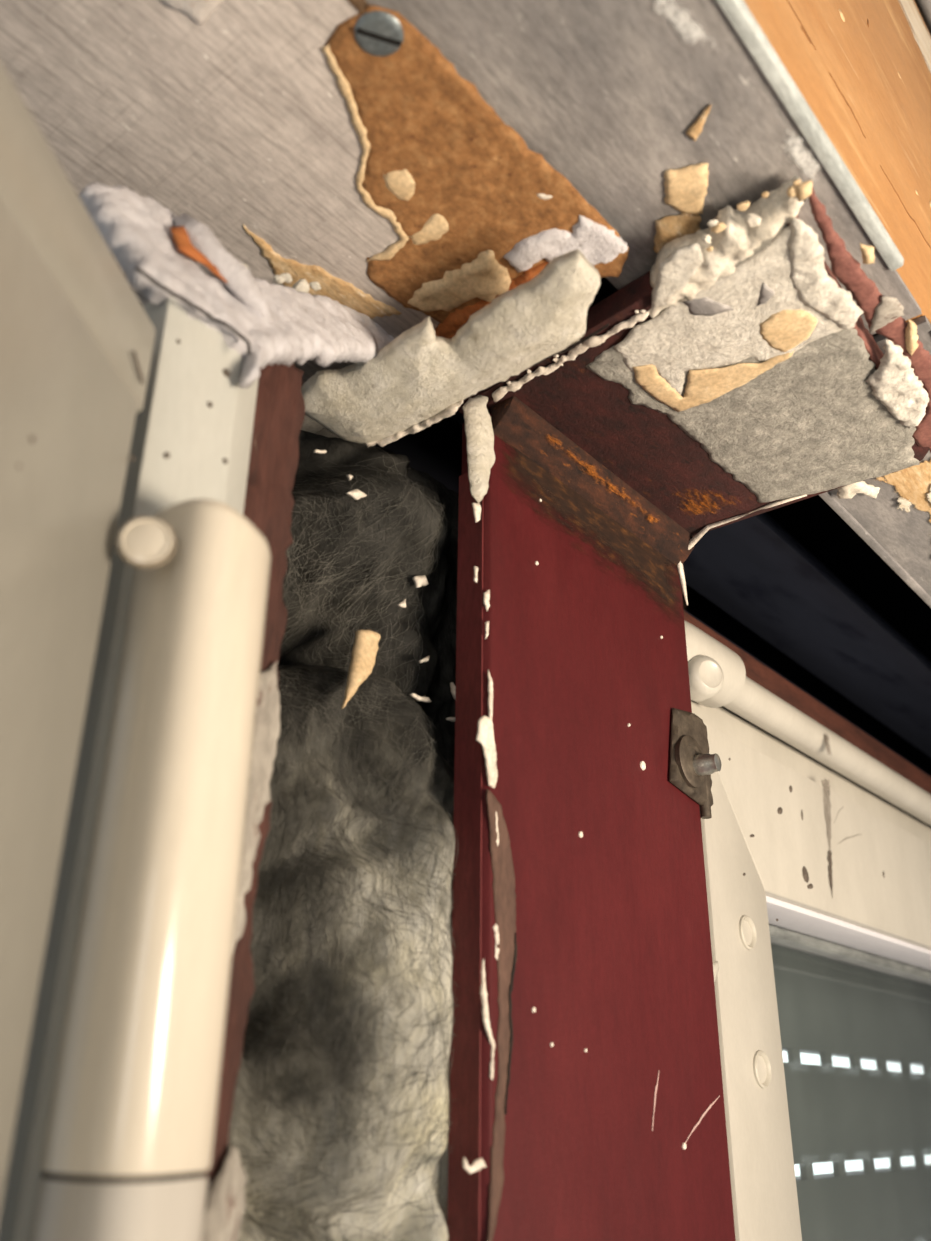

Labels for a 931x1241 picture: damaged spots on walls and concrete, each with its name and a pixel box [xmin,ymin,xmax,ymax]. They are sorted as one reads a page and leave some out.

flaking render [161,0,224,25]
crack [787,0,866,138]
peeling [79,5,629,389]
crack [880,165,931,249]
peeling [492,163,931,523]
flaking render [365,400,463,448]
spalling [472,502,481,523]
corrosion [549,435,657,522]
corrosion [677,491,740,515]
spalling [474,566,490,639]
peeling [463,669,517,1241]